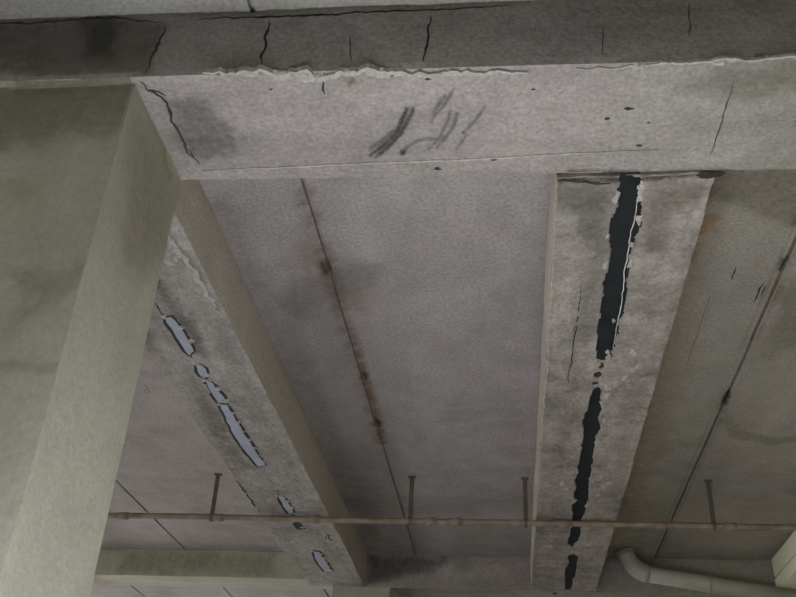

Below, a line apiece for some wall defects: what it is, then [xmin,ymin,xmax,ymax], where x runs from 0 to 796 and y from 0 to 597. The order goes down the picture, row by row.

crack [199,5,509,64]
crack [0,16,199,164]
crack [568,281,583,384]
spalling [161,314,266,468]
spalling [275,494,306,530]
spalling [311,550,334,572]